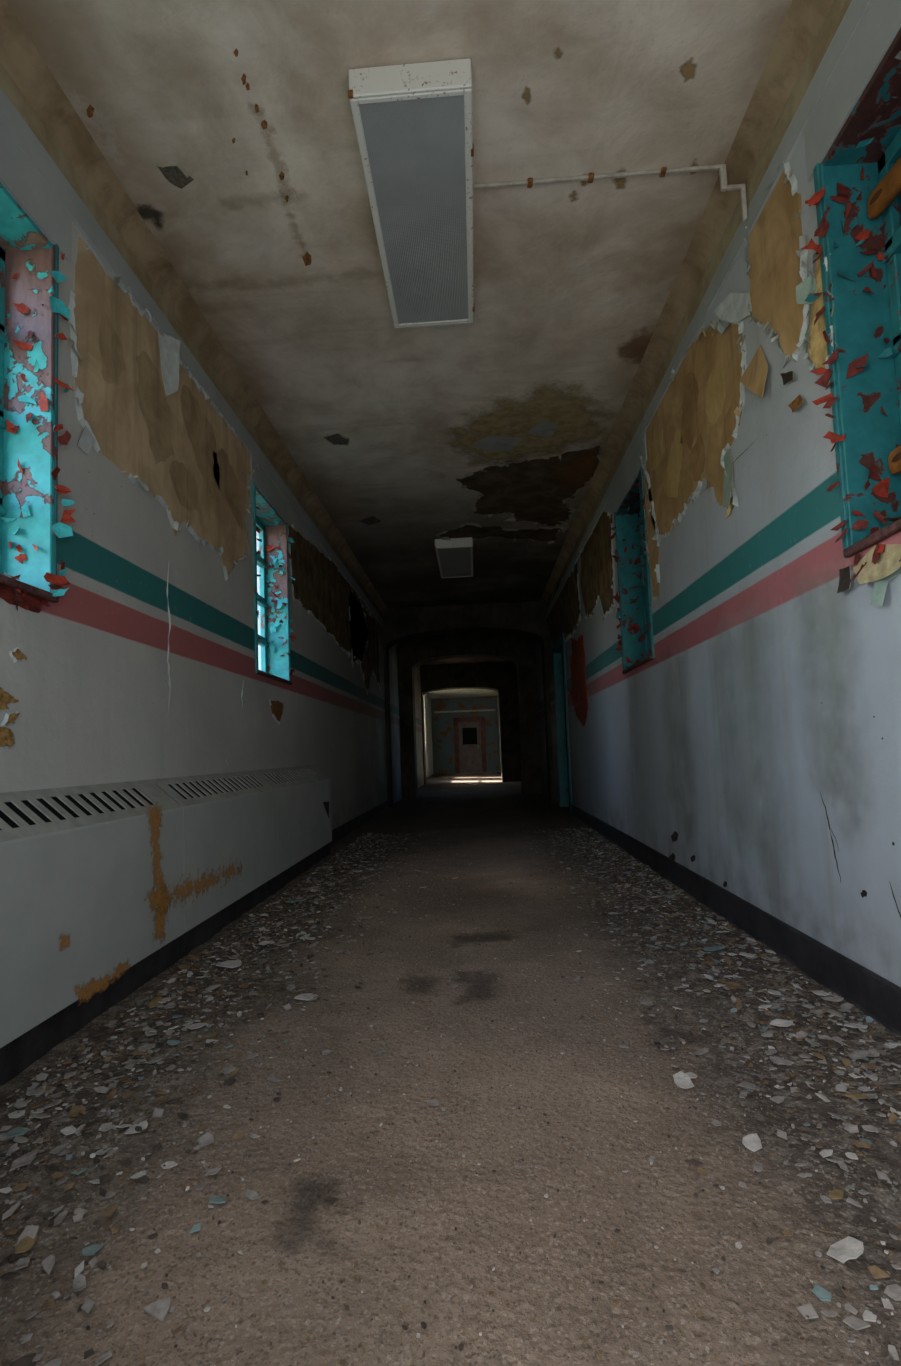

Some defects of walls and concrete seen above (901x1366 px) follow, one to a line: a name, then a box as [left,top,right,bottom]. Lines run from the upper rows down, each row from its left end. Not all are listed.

peeling [0,236,381,695]
peeling [435,435,605,544]
peeling [546,161,901,726]
peeling [0,686,20,749]
rust [147,805,242,940]